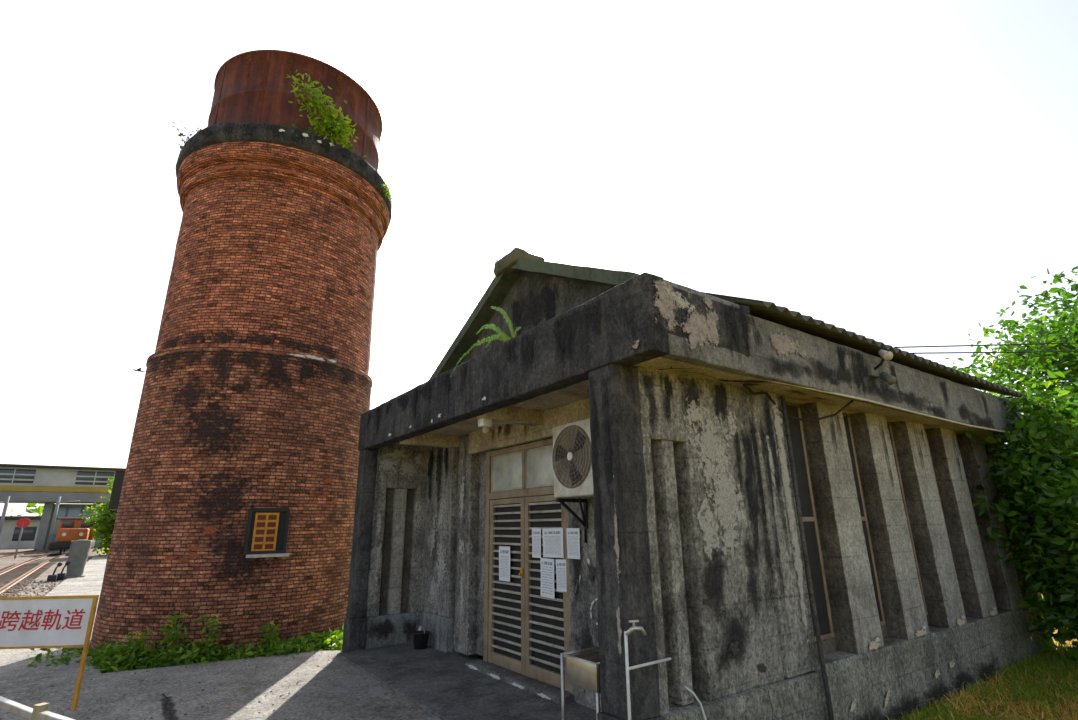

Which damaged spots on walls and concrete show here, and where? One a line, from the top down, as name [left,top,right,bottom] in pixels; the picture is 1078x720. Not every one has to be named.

leakage [505,284,600,371]
leakage [367,364,466,428]
leakage [644,373,702,430]
leakage [721,301,994,429]
leakage [149,330,368,590]
leakage [428,447,448,519]
leakage [704,383,775,667]
leakage [370,619,416,639]
crack [161,693,178,720]